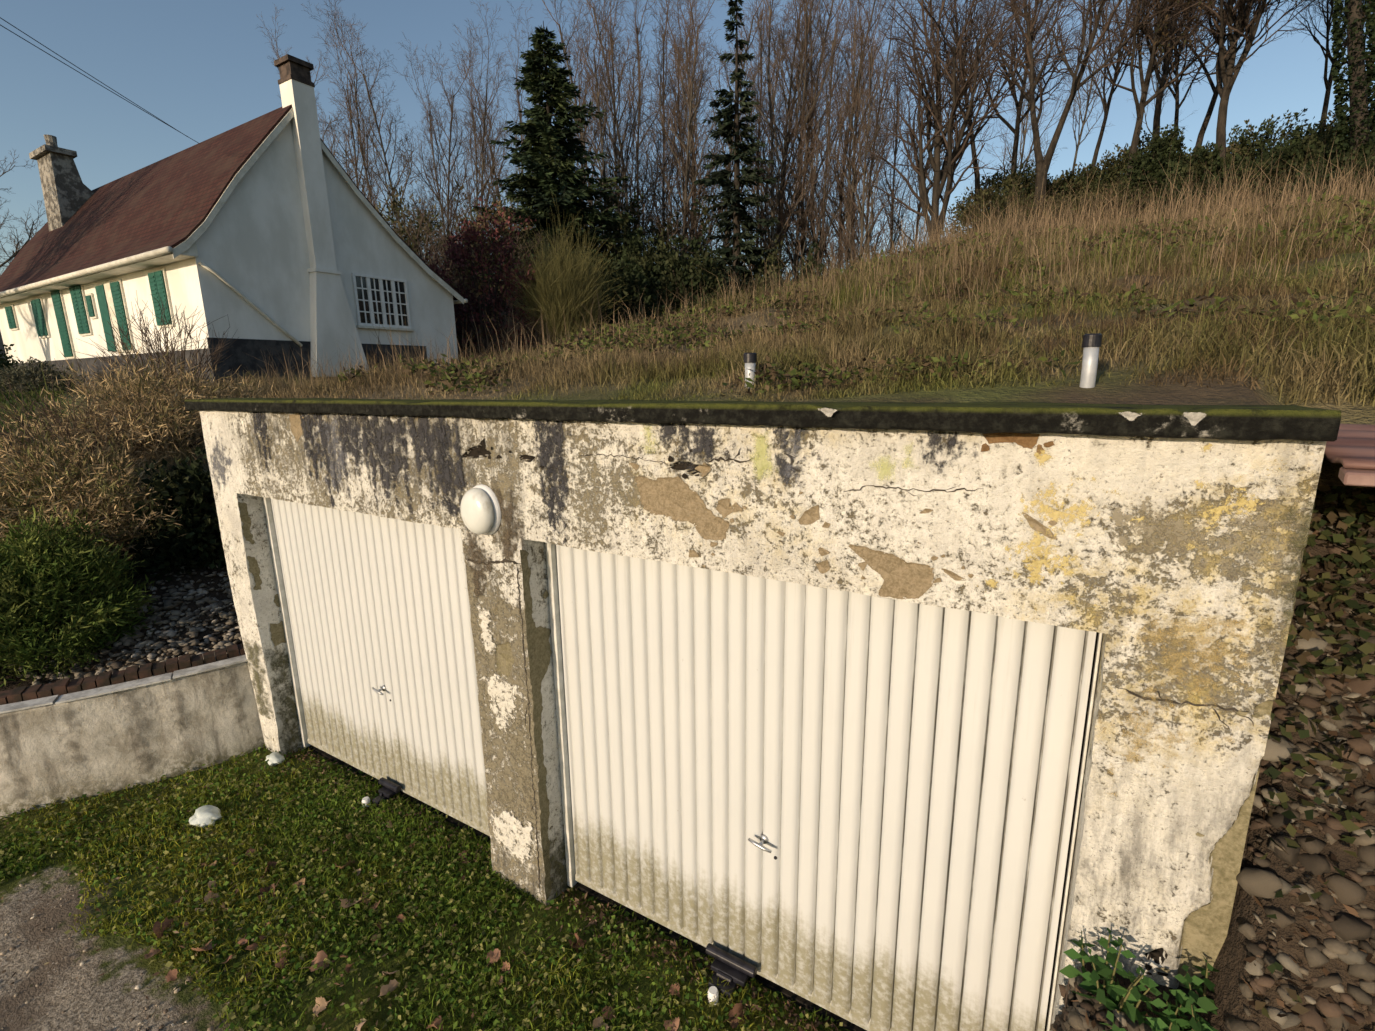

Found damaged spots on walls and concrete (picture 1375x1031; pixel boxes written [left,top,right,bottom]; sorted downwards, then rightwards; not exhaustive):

water stain [300,413,524,599]
water stain [534,420,572,544]
peeling [629,449,747,568]
peeling [777,491,830,537]
peeling [816,547,830,574]
peeling [848,544,974,599]
water stain [1280,503,1315,621]
water stain [244,640,302,754]
crack [1116,684,1254,731]
water stain [543,834,569,899]
flaking render [1145,756,1264,987]